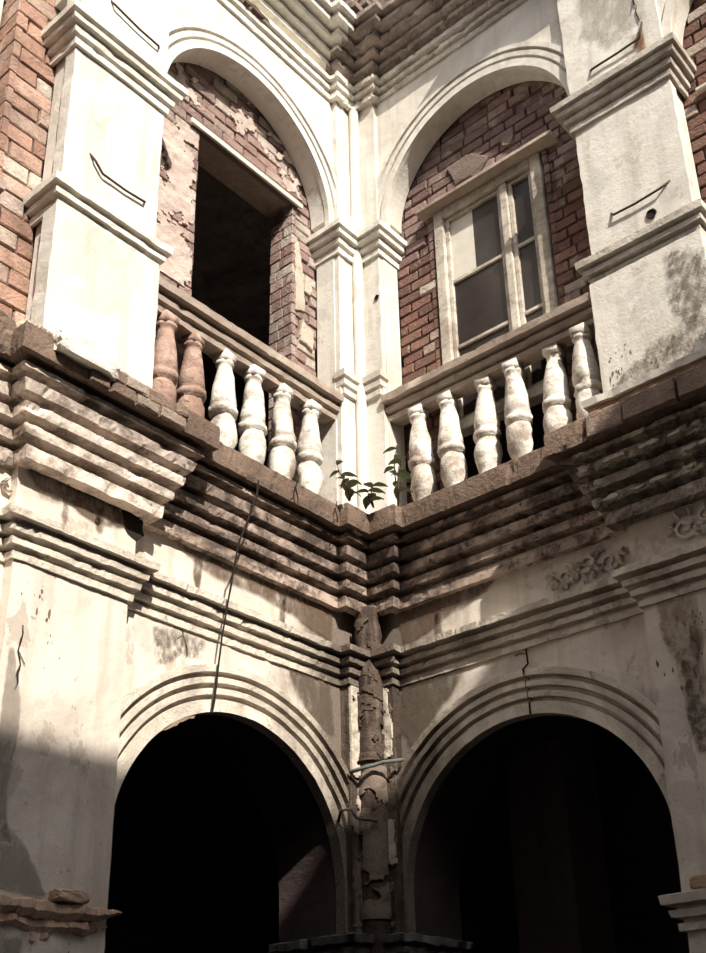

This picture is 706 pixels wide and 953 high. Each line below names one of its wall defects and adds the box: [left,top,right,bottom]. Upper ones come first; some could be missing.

flaking render [156,117,198,287]
flaking render [167,62,200,106]
flaking render [226,80,302,200]
water stain [617,250,706,386]
crack [15,625,25,689]
flaking render [354,617,369,631]
crack [515,649,532,714]
water stain [658,598,706,752]
water stain [0,647,44,895]
flaking render [348,639,398,928]